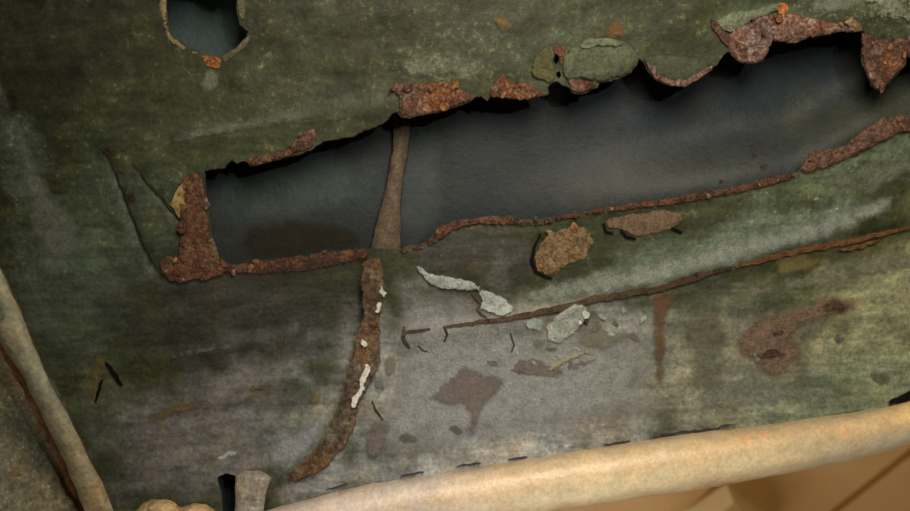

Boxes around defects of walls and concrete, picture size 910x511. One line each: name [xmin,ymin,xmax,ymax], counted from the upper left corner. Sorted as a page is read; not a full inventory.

peeling [866,0,910,21]
corrosion [389,79,473,118]
corrosion [490,74,543,100]
corrosion [400,114,910,254]
corrosion [160,172,367,284]
peeling [351,155,910,456]
corrosion [738,298,853,376]
crack [889,390,910,405]